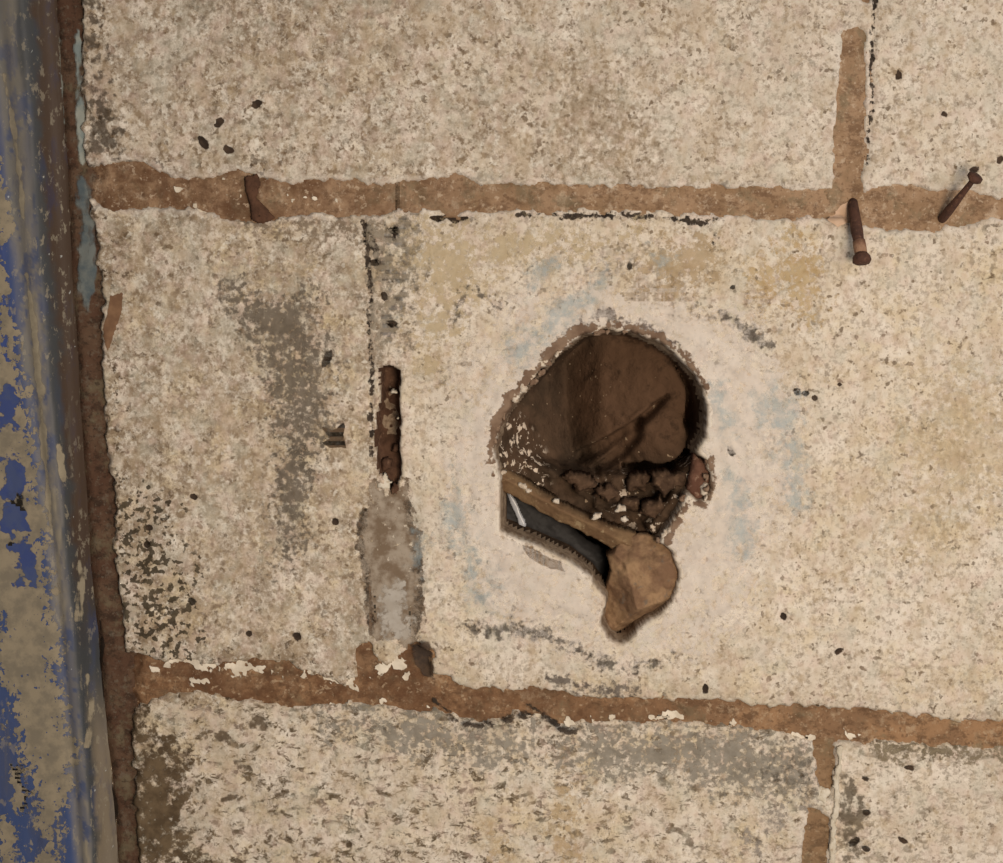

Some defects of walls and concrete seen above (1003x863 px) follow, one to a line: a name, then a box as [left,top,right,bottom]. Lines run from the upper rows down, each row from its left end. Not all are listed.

peeling [0,73,25,246]
peeling [0,259,94,863]
crack [360,219,397,463]
spalling [485,319,717,582]